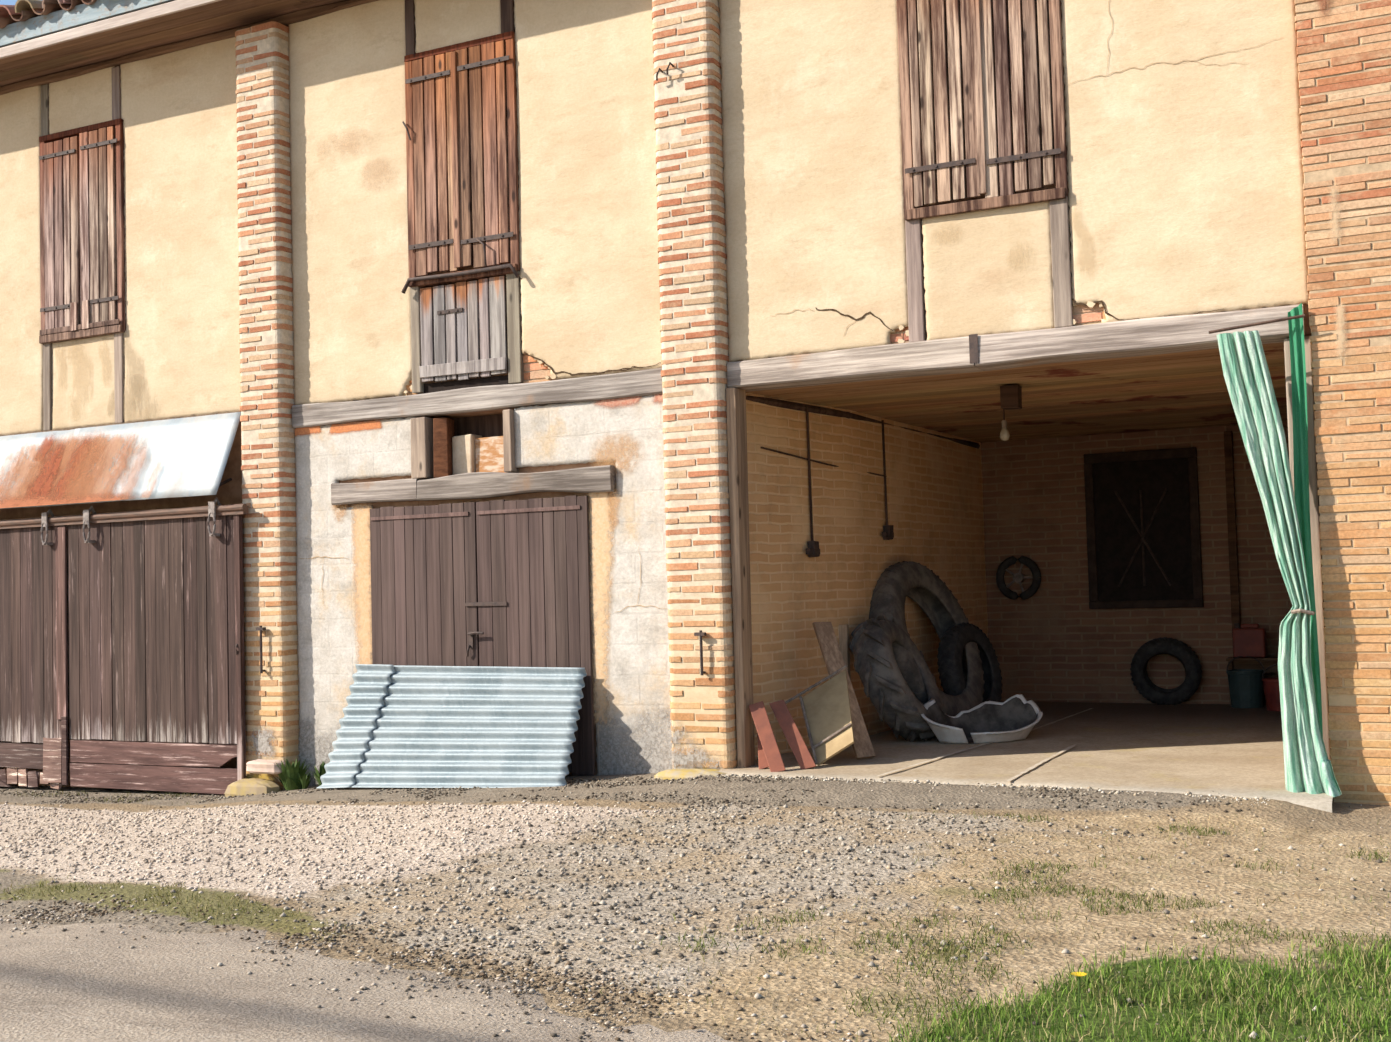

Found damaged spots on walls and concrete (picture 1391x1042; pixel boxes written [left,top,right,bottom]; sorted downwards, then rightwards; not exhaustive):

crack [1065,2,1283,86]
crack [770,308,893,334]
flaking render [1072,301,1106,326]
flaking render [523,353,560,383]
rust [0,433,138,508]